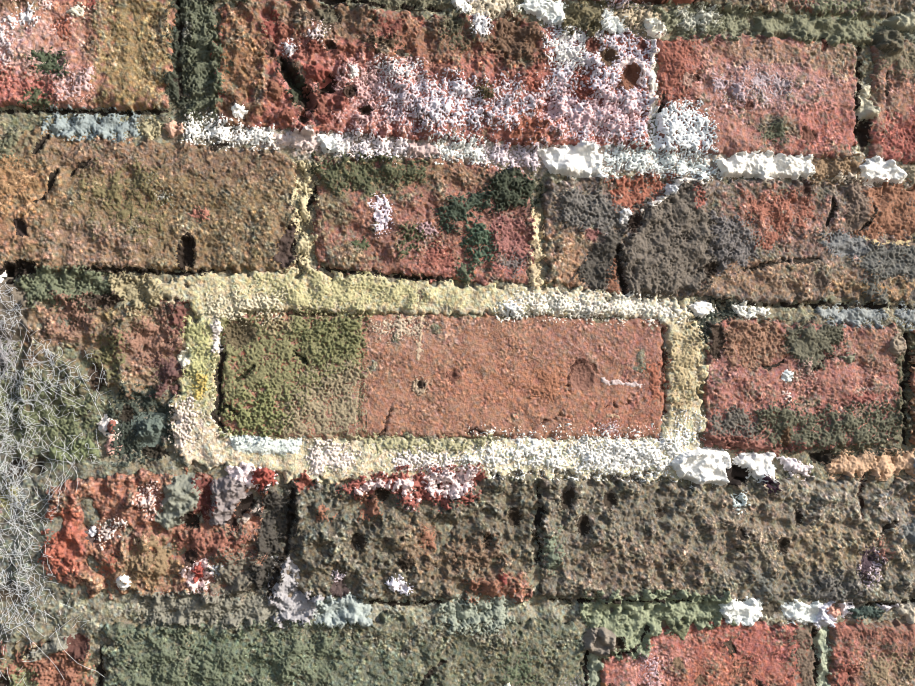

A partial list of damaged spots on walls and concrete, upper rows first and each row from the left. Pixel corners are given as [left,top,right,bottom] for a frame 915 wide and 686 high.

leakage [162,0,816,289]